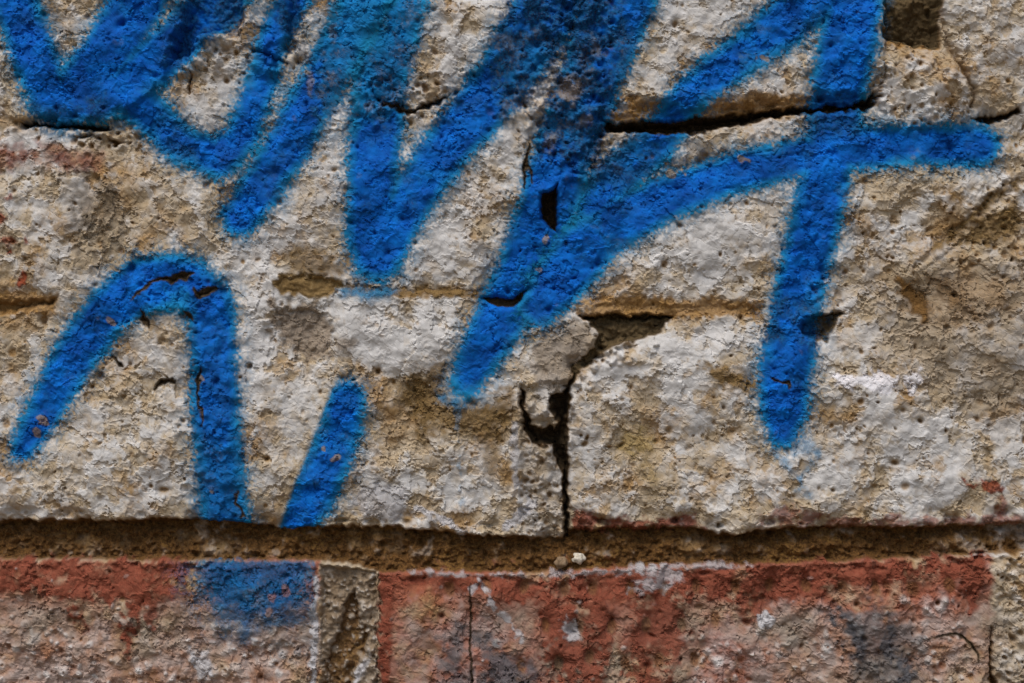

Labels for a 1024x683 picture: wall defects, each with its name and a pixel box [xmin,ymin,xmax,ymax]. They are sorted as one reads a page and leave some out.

crack [520,388,571,537]